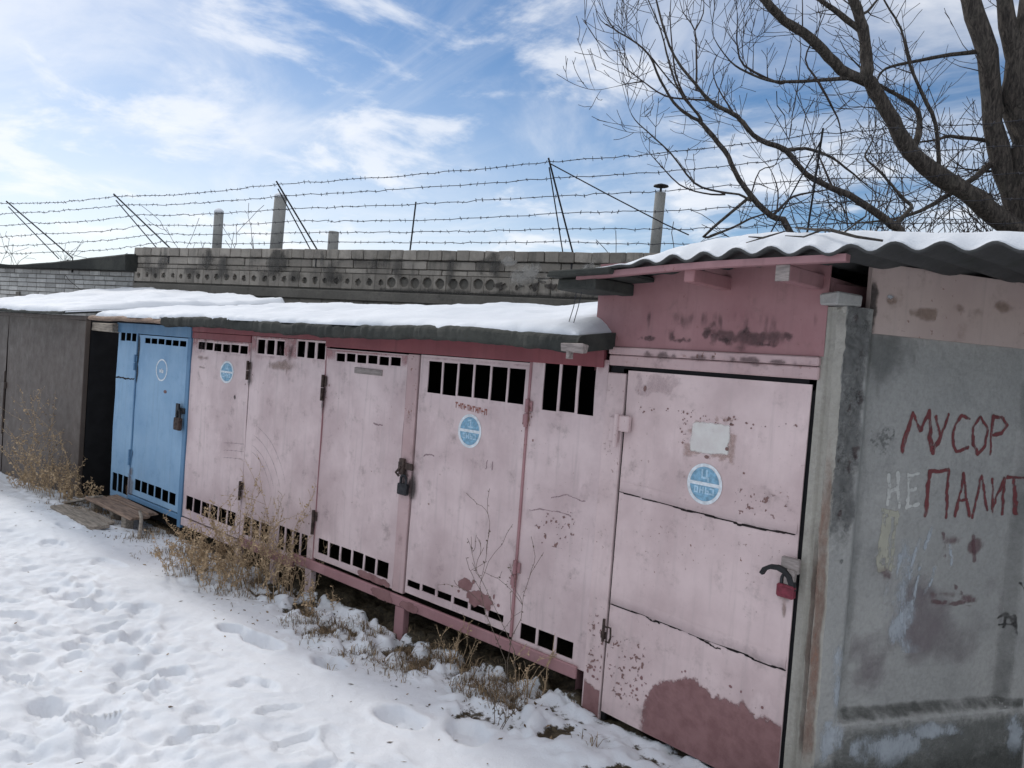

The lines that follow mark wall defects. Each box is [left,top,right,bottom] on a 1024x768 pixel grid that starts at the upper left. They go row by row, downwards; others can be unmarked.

crack [619,491,796,535]
peeling [457,577,500,611]
corrosion [586,615,645,701]
crack [611,604,786,671]
peeling [629,670,781,768]